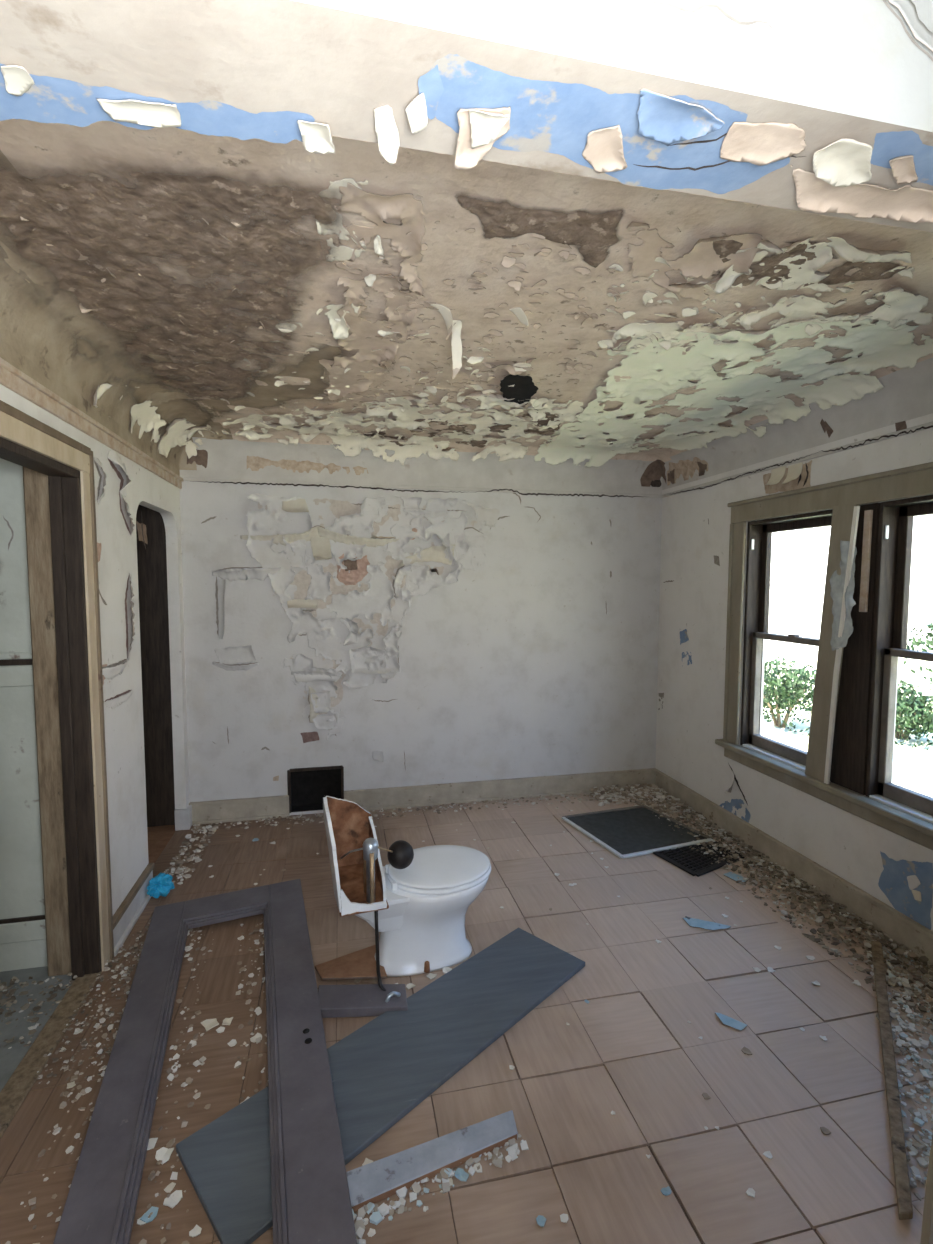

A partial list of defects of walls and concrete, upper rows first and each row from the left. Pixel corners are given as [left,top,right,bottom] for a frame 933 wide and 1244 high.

crack [883,0,933,61]
peeling [374,54,933,223]
flaking render [0,167,933,487]
water stain [127,345,343,430]
peeling [94,450,148,549]
peeling [763,460,812,494]
peeling [102,573,135,684]
peeling [212,492,500,743]
peeling [104,690,132,709]
peeling [878,851,933,930]